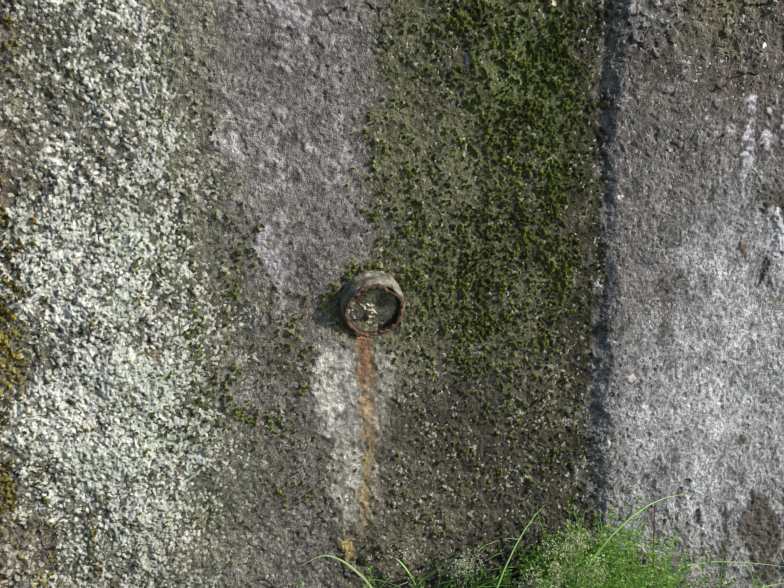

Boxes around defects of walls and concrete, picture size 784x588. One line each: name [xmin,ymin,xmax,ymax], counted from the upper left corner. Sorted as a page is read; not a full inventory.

leakage [310,337,397,541]
corrosion [349,330,373,521]
corrosion [340,539,353,562]
leakage [719,488,781,588]